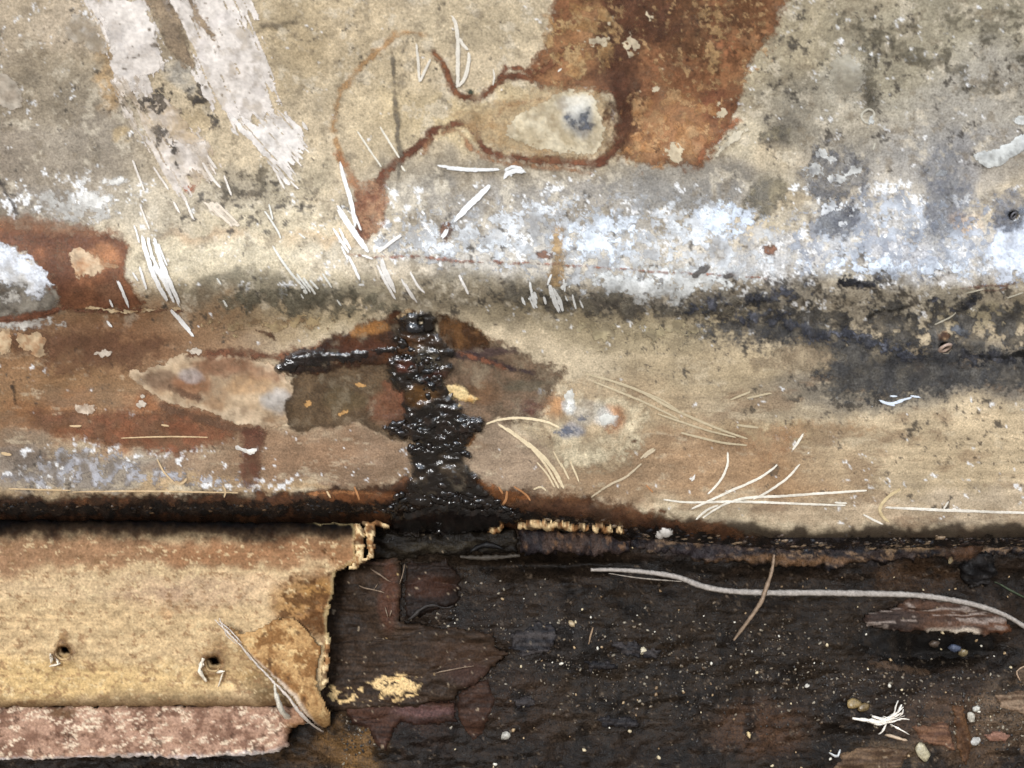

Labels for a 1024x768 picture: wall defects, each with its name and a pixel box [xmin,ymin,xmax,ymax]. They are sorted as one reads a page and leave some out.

corrosion [332,0,786,241]
corrosion [0,216,163,374]
water stain [374,140,1024,409]
corrosion [30,404,250,457]
water stain [285,362,411,441]